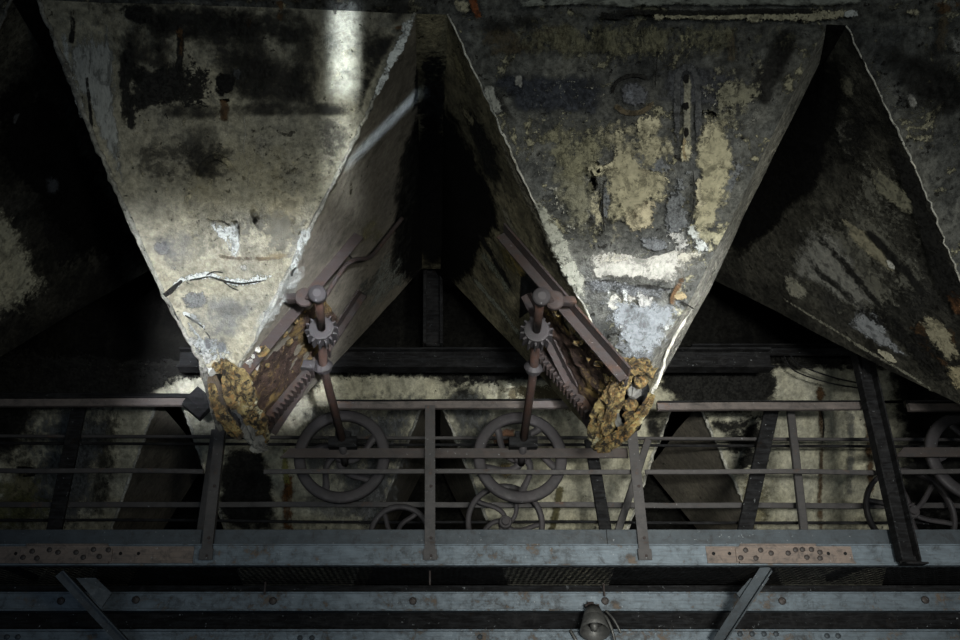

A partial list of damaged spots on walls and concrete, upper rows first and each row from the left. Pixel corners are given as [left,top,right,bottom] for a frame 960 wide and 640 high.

leakage [175,33,184,72]
spalling [37,0,377,453]
peeling [554,114,673,237]
spalling [590,116,734,282]
peeling [777,121,956,392]
spalling [587,291,692,453]